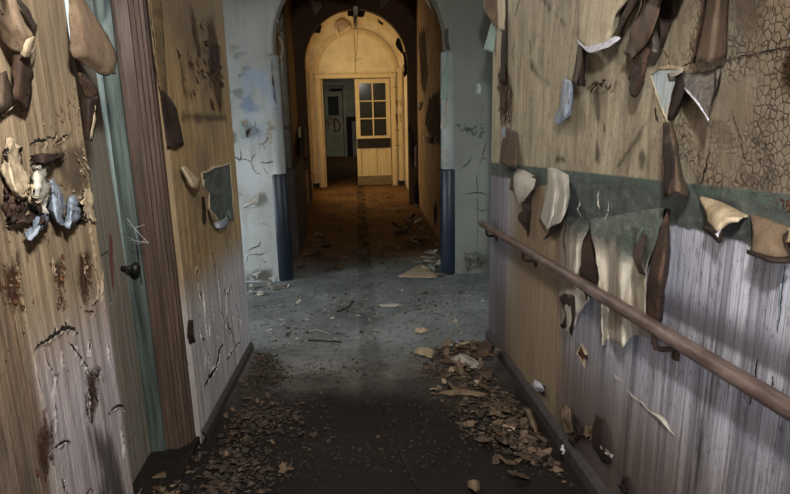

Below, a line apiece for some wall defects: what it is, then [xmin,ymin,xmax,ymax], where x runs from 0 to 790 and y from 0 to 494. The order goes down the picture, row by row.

peeling [0,0,118,241]
flaking render [150,0,184,147]
crack [235,119,273,175]
peeling [396,28,488,168]
peeling [483,0,790,336]
crack [700,147,710,185]
crack [725,46,790,62]
crack [34,219,126,460]
flaking render [187,320,195,344]
peeling [601,303,652,347]
crack [62,477,93,494]
leakage [93,432,124,494]